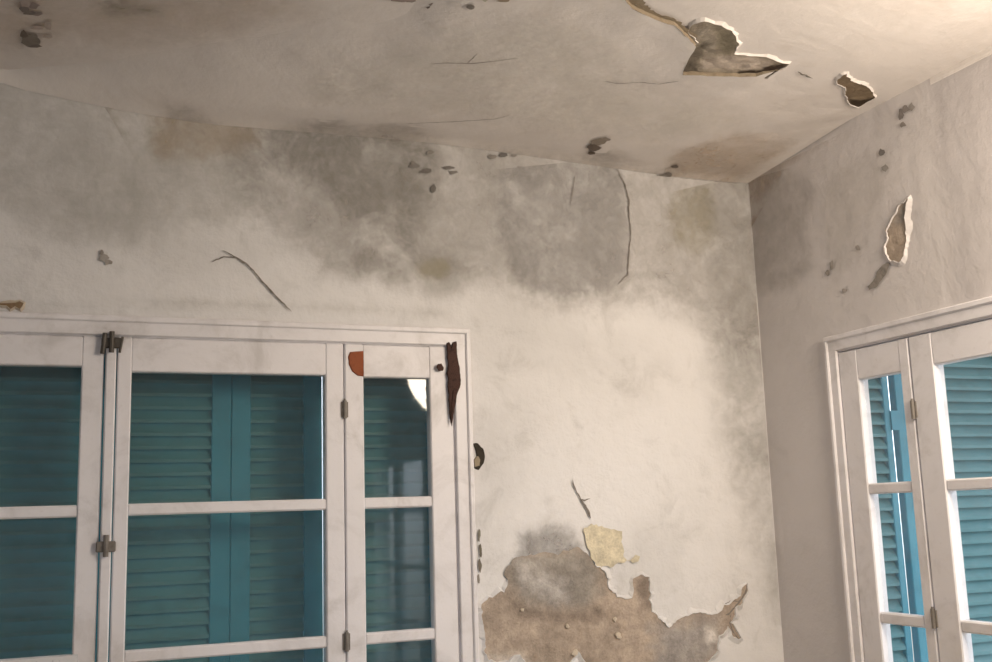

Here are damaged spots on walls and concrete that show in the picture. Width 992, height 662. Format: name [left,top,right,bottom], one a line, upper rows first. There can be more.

flaking render [683,17,792,79]
flaking render [834,71,877,108]
flaking render [867,195,913,290]
flaking render [0,300,26,312]
crack [212,251,291,311]
corrosion [348,351,364,376]
flaking render [473,443,485,470]
flaking render [478,524,749,662]